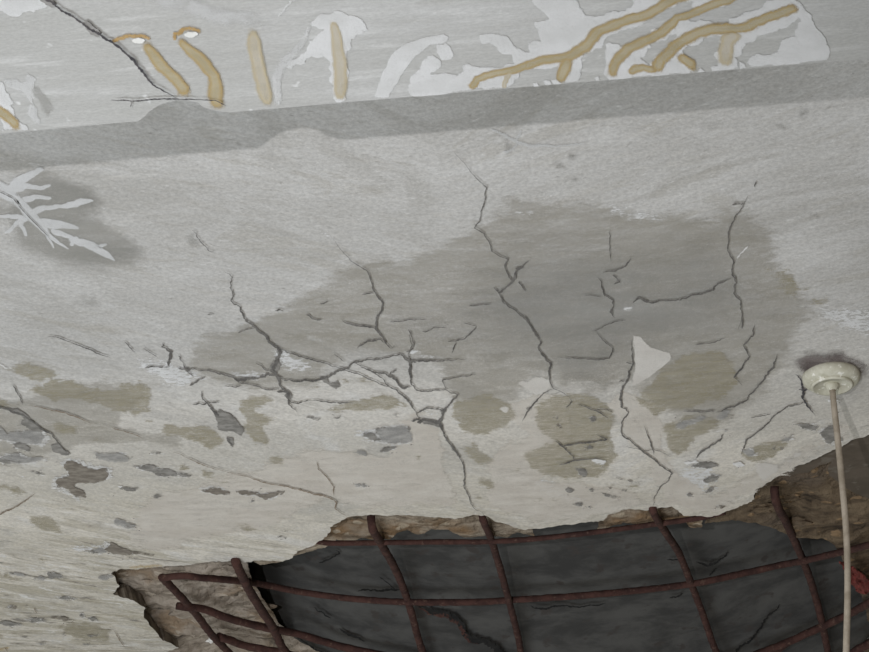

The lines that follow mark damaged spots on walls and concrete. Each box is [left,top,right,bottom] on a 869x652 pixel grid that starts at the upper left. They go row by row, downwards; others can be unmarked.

leakage [0,74,53,131]
crack [40,0,224,107]
leakage [272,11,368,106]
leakage [375,0,830,98]
leakage [0,167,168,273]
crack [0,365,92,456]
crack [48,336,108,357]
peeling [9,362,152,422]
peeling [0,421,285,503]
crack [125,152,813,518]
peeling [636,349,738,494]
spalling [84,393,869,652]